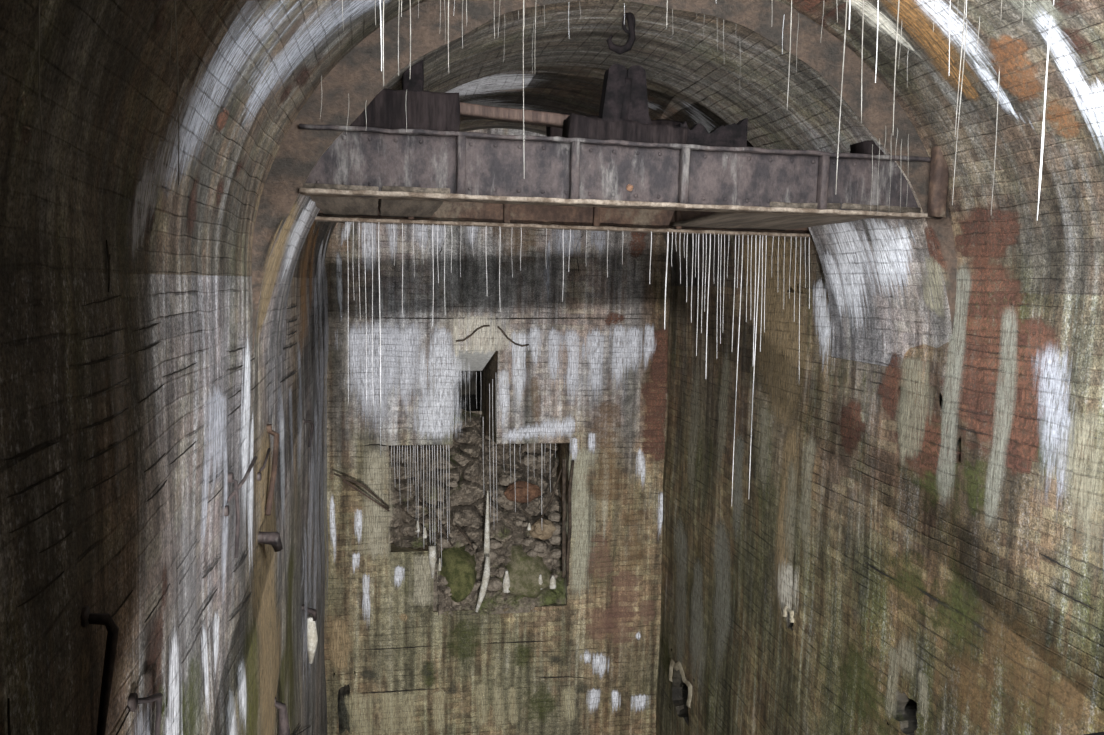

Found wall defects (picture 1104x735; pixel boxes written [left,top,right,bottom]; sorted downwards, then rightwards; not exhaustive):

damp [348,316,654,460]
damp [1036,350,1104,542]
flaking render [413,556,431,607]
damp [584,652,609,677]
damp [579,684,618,710]
damp [631,695,645,710]